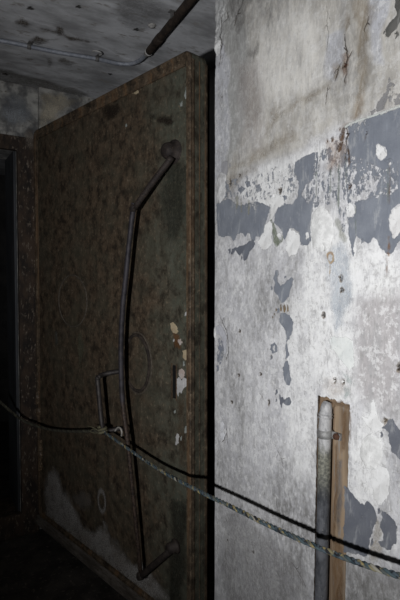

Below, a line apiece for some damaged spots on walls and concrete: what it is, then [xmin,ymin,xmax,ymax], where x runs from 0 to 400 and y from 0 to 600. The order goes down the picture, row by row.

crack [325,34,352,104]
peeling [216,78,400,261]
peeling [271,270,293,385]
peeling [361,399,400,459]
peeling [343,465,397,557]